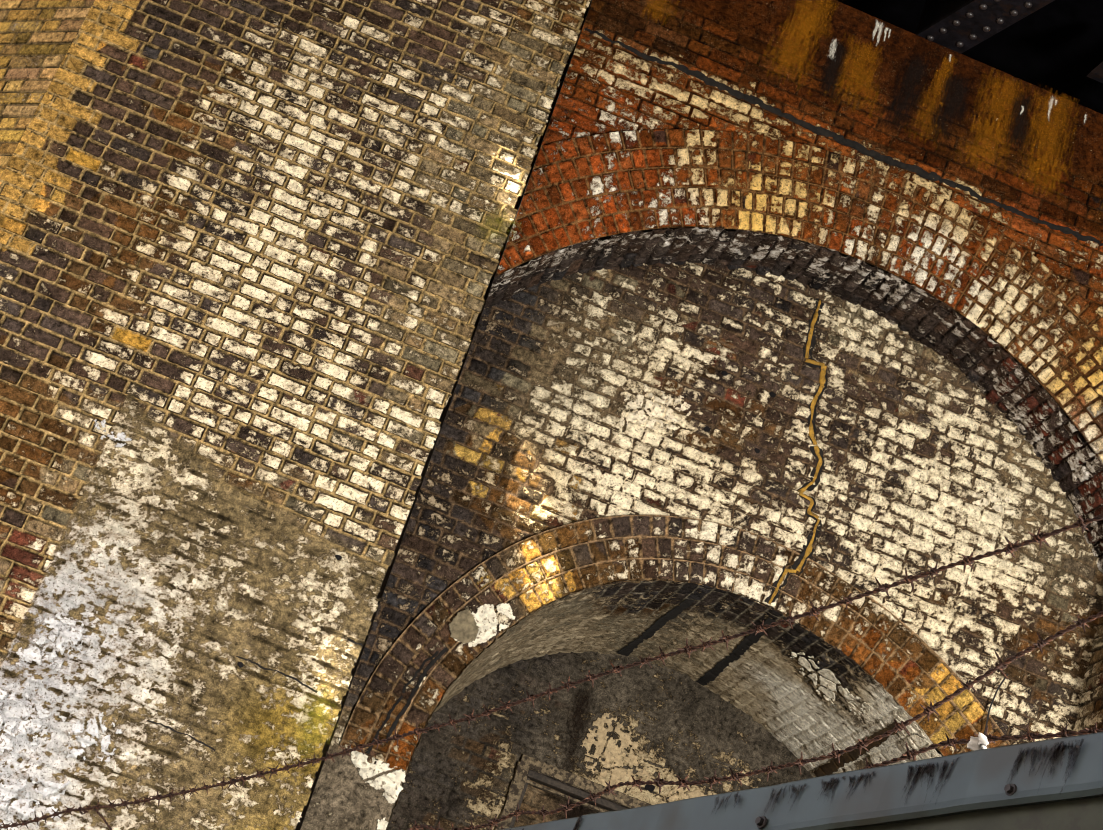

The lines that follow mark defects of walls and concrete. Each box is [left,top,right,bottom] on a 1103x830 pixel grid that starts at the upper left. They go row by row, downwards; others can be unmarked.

crack [585,28,1103,246]
crack [696,298,828,686]
peeling [449,603,515,647]
peeling [339,738,406,804]
peeling [377,817,388,830]